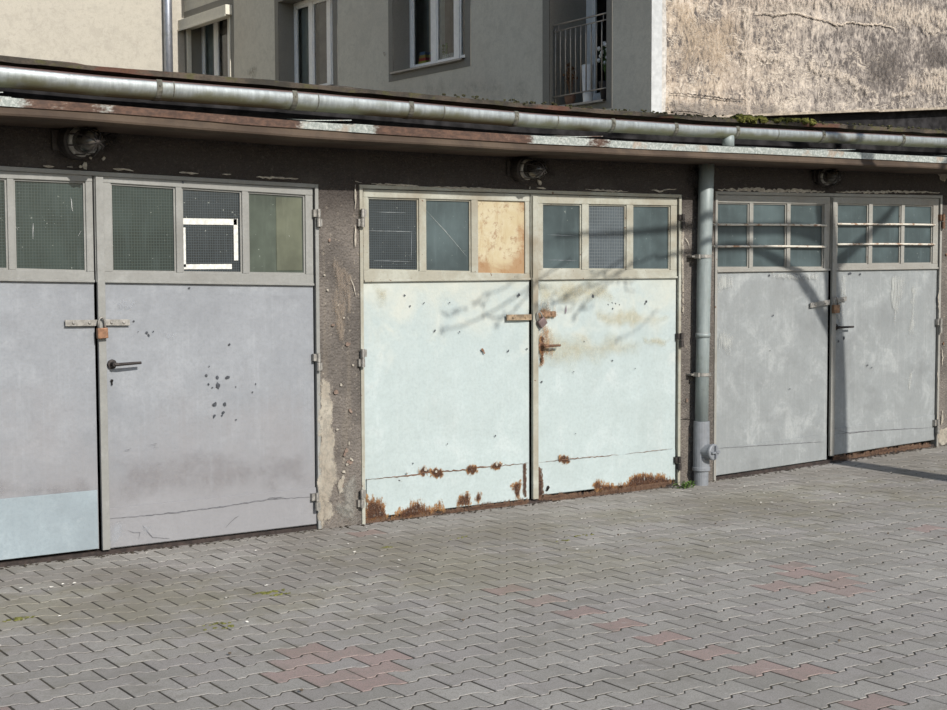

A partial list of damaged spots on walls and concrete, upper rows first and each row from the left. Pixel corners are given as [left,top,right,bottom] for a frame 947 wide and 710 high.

corrosion [538,308,556,366]
peeling [317,379,353,527]
corrosion [365,463,674,524]